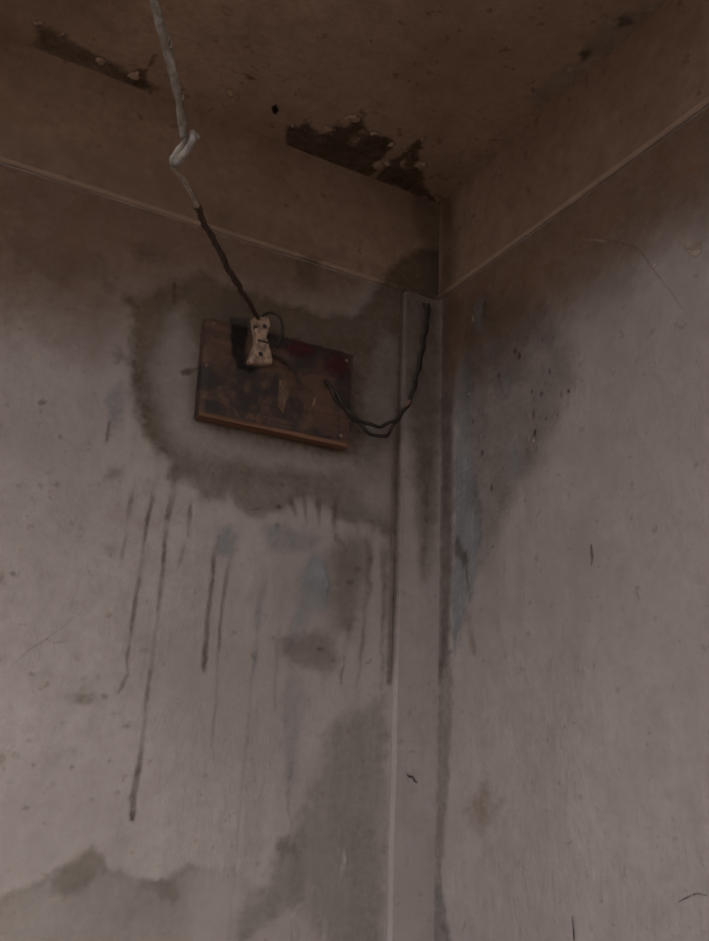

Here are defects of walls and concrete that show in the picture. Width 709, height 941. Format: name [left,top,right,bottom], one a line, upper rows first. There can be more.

flaking render [287,115,442,203]
damp [127,250,455,527]